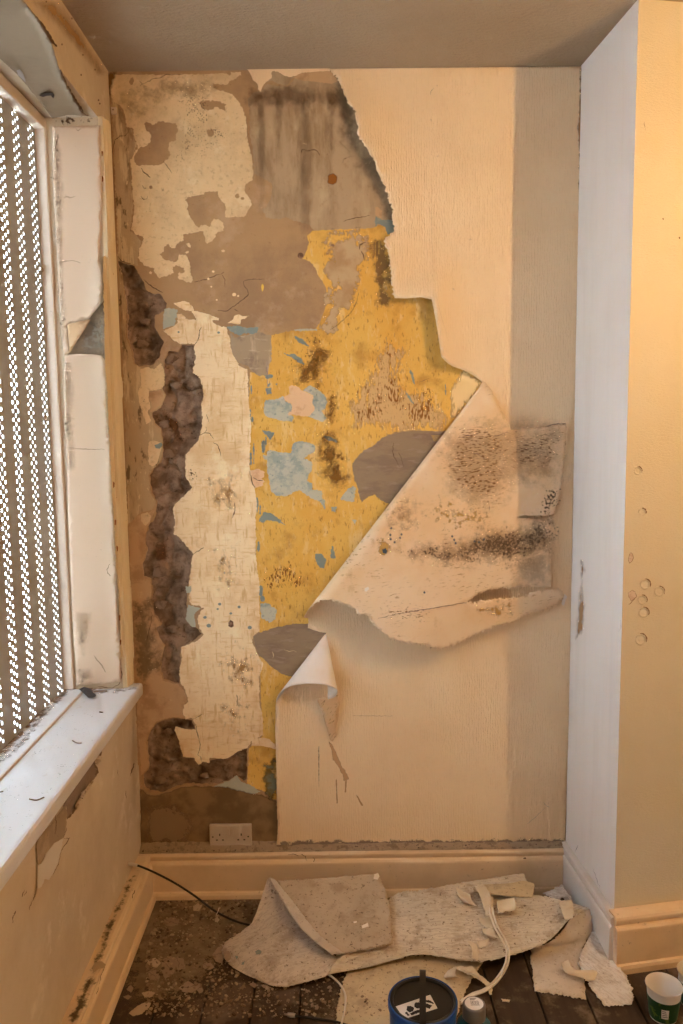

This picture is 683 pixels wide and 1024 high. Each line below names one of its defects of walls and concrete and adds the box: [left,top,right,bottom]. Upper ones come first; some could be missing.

damp [328,95,350,119]
peeling [320,228,370,334]
peeling [68,72,254,683]
peeling [264,338,567,650]
damp [408,423,561,566]
peeling [276,635,340,741]
peeling [36,751,102,888]
spalling [132,704,276,853]